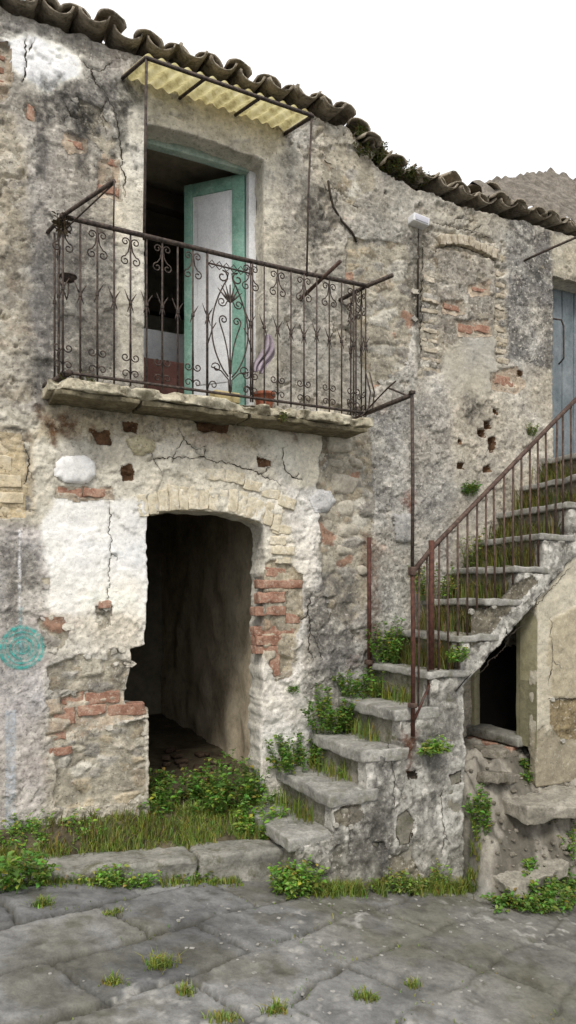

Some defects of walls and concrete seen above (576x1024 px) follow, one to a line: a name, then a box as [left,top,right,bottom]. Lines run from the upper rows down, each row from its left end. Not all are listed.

crack [22,39,33,82]
crack [64,62,126,198]
flaking render [440,279,492,338]
flaking render [490,366,526,394]
crack [136,433,302,485]
crack [107,502,117,598]
flaking render [249,560,305,682]
peeling [37,614,148,812]
peeling [374,811,424,884]